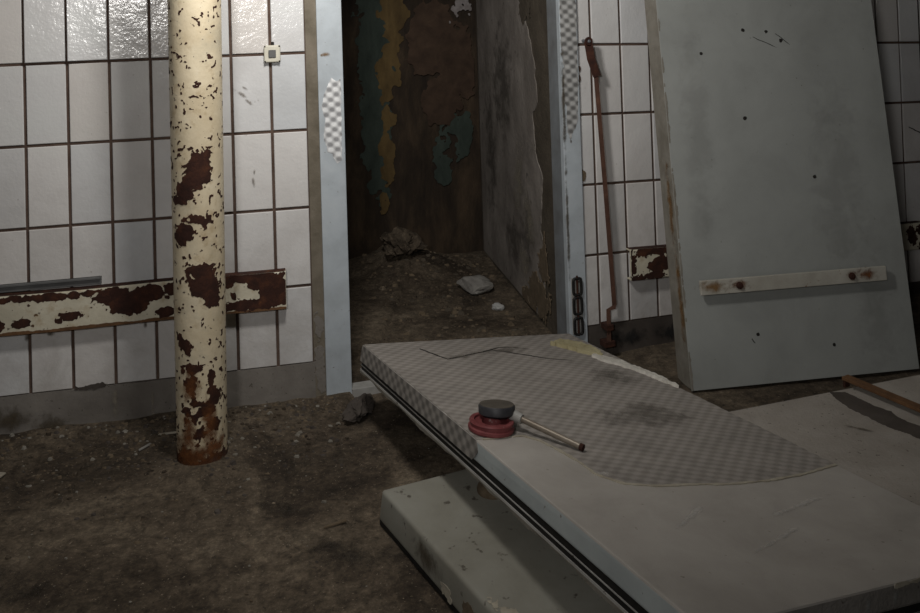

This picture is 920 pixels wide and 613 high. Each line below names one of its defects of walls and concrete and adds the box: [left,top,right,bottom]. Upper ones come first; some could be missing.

corrosion [172,146,214,247]
spalling [168,29,223,194]
peeling [351,0,410,215]
peeling [432,0,545,298]
corrosion [0,277,174,340]
corrosion [182,259,286,314]
corrosion [177,333,228,466]